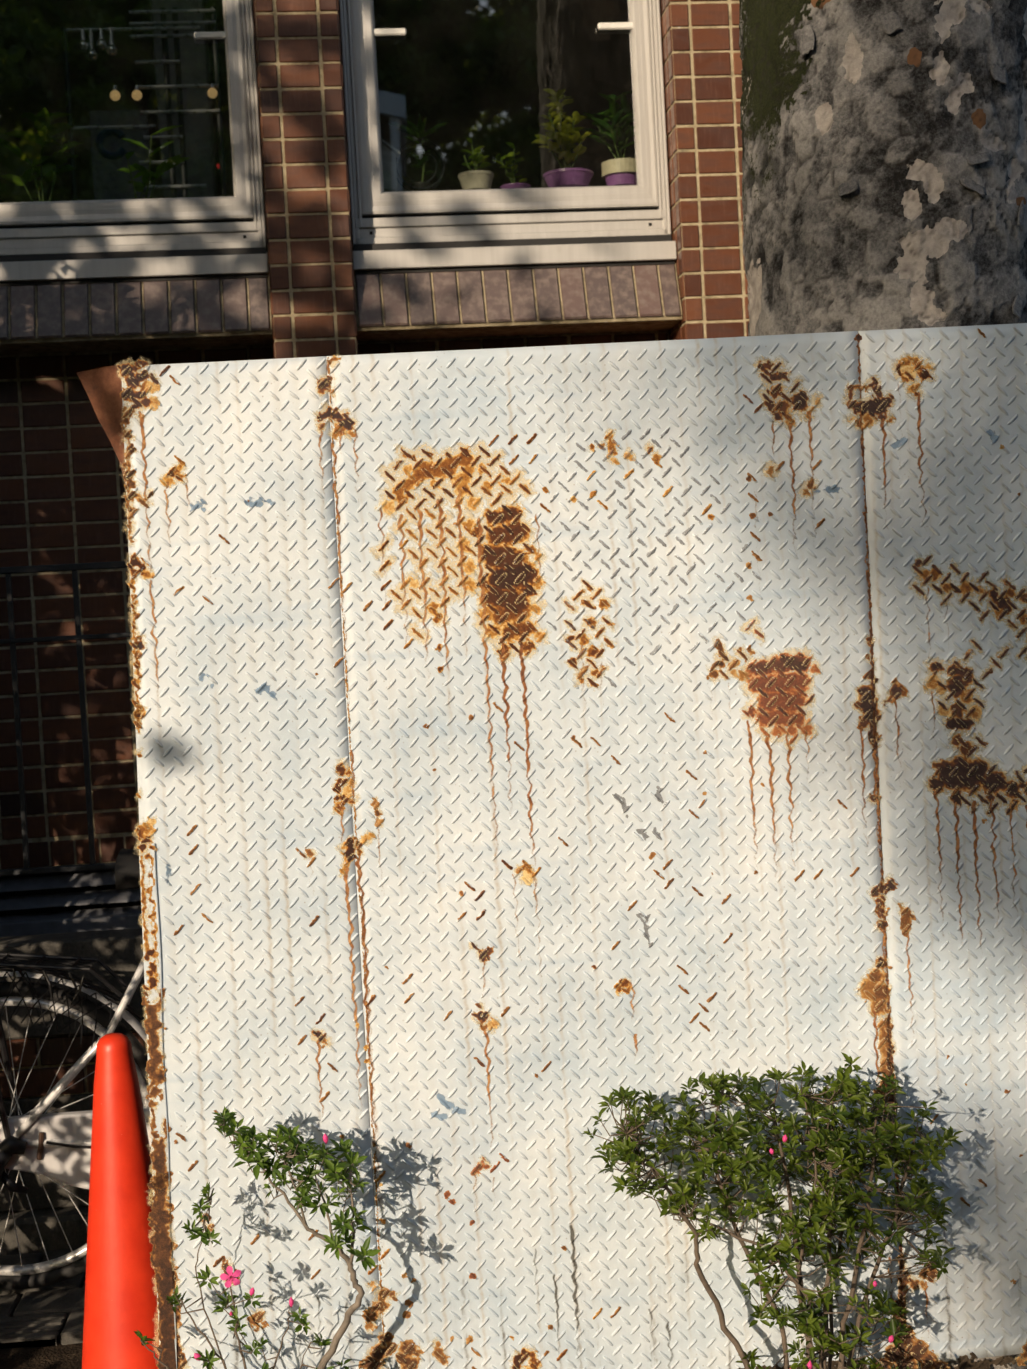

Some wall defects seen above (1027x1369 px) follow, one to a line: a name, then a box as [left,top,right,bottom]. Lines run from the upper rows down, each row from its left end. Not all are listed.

rust [117,359,188,733]
rust [363,433,550,907]
rust [564,580,615,687]
rust [706,618,821,844]
rust [743,360,823,569]
rust [837,333,1027,1137]
rust [315,355,485,1369]
rust [469,942,510,1137]
rust [614,978,635,1011]
rust [471,1153,509,1189]
rust [509,1336,568,1369]
rust [875,1243,1027,1369]